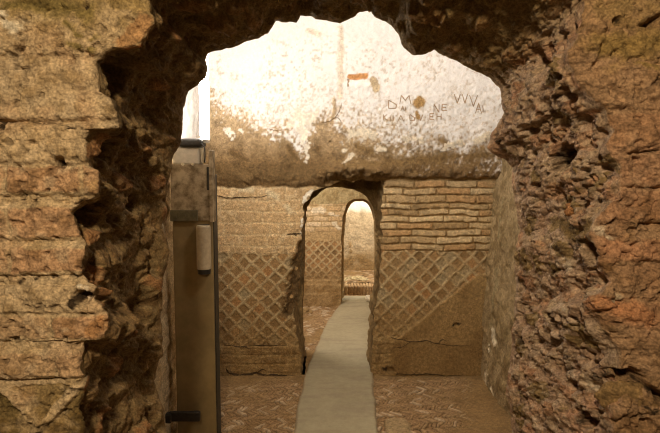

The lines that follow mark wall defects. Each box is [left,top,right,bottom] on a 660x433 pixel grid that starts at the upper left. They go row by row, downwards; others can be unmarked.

spalling [346,72,382,94]
peeling [222,127,244,141]
peeling [285,100,321,164]
peeling [341,126,388,164]
peeling [439,127,493,151]
crack [391,337,468,348]
crack [226,368,287,376]